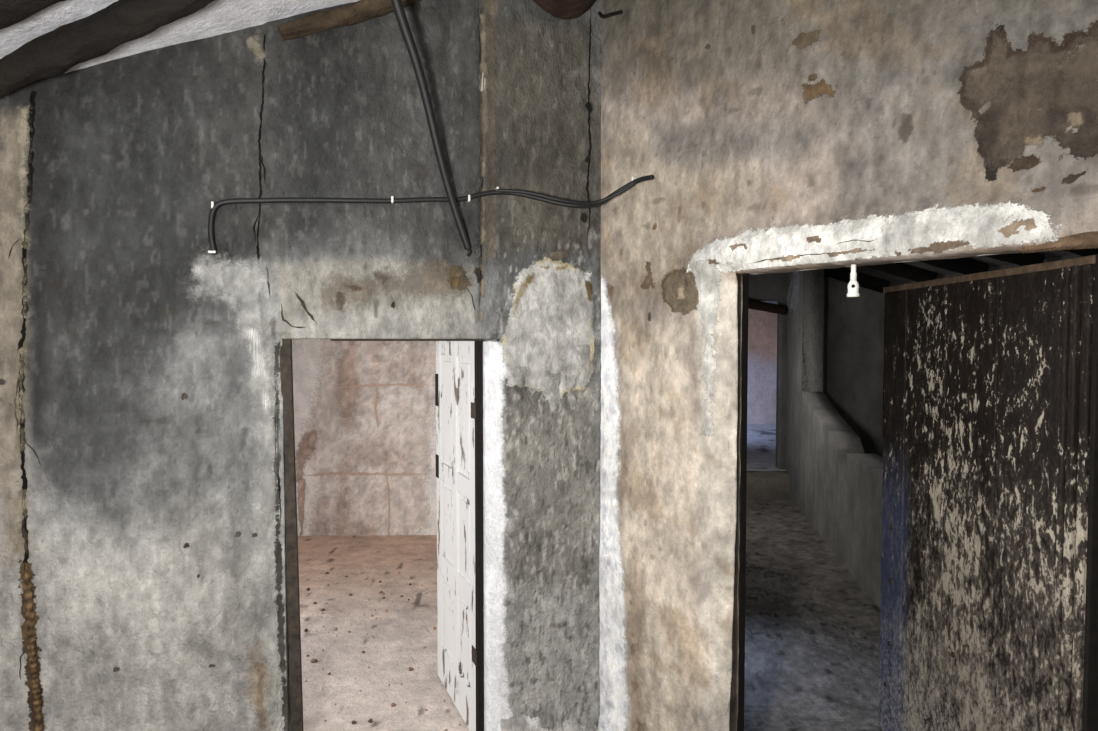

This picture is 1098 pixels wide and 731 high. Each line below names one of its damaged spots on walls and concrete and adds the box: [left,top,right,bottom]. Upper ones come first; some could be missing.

peeling [801,74,837,104]
peeling [957,20,1098,184]
crack [247,34,316,328]
peeling [998,218,1037,238]
peeling [828,248,875,257]
peeling [894,240,970,256]
spalling [641,261,699,315]